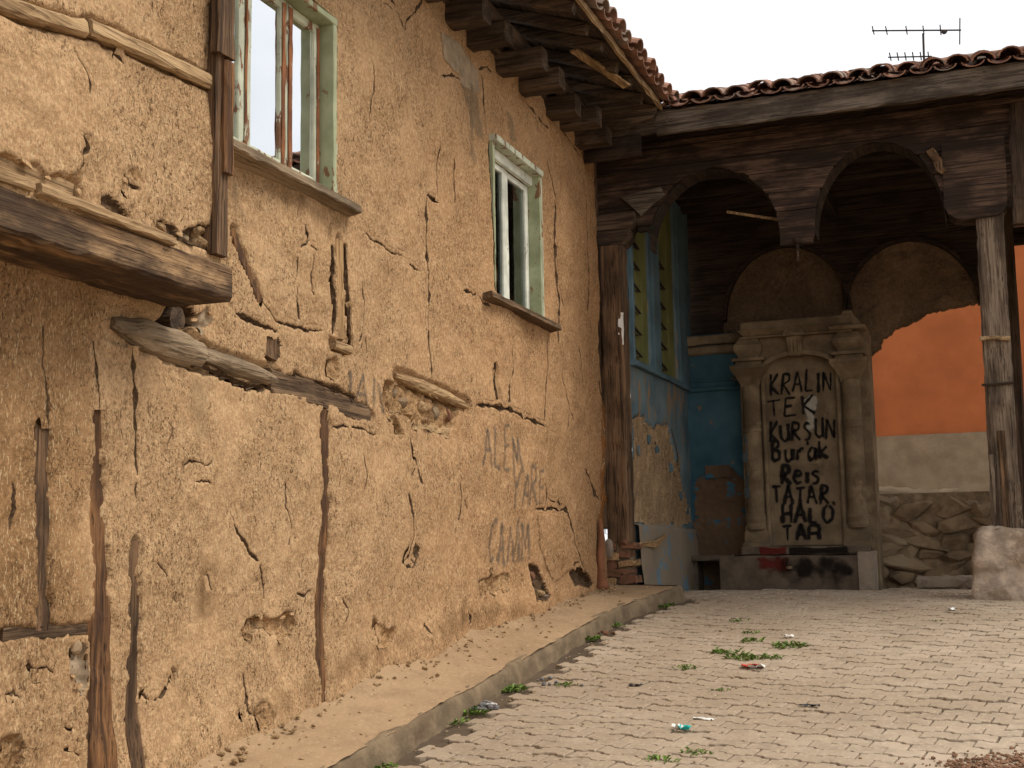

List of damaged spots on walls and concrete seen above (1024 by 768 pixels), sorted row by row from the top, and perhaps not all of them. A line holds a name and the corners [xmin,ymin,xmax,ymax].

spalling [101,167,145,216]
spalling [156,219,208,249]
crack [235,142,458,378]
crack [476,160,603,443]
spalling [380,376,458,439]
crack [88,339,268,602]
crack [404,434,425,568]
crack [535,483,585,572]
peeling [632,413,748,590]
spalling [241,611,298,643]
spalling [528,564,552,601]
spalling [569,567,592,589]